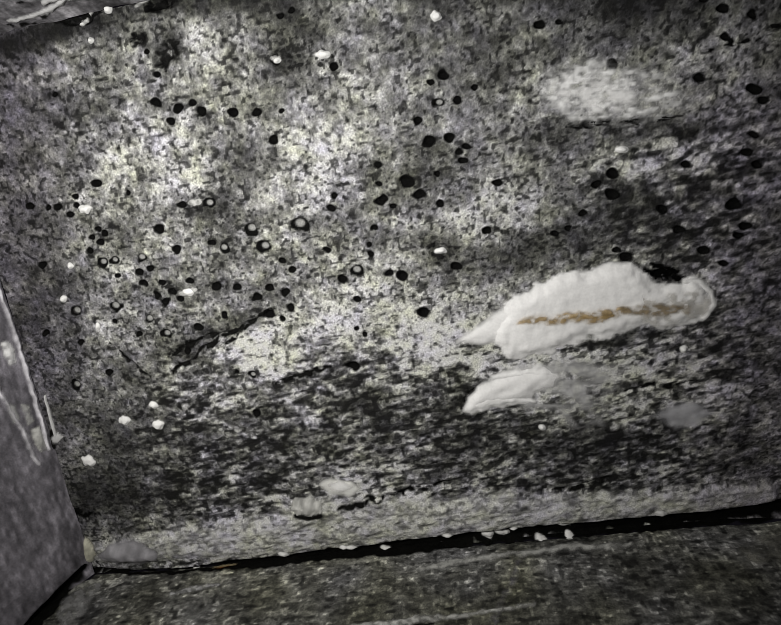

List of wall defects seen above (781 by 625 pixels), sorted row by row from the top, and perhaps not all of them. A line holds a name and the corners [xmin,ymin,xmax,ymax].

crack [168,308,275,375]
leakage [457,262,717,413]
corrosion [519,304,683,324]
leakage [662,404,708,426]